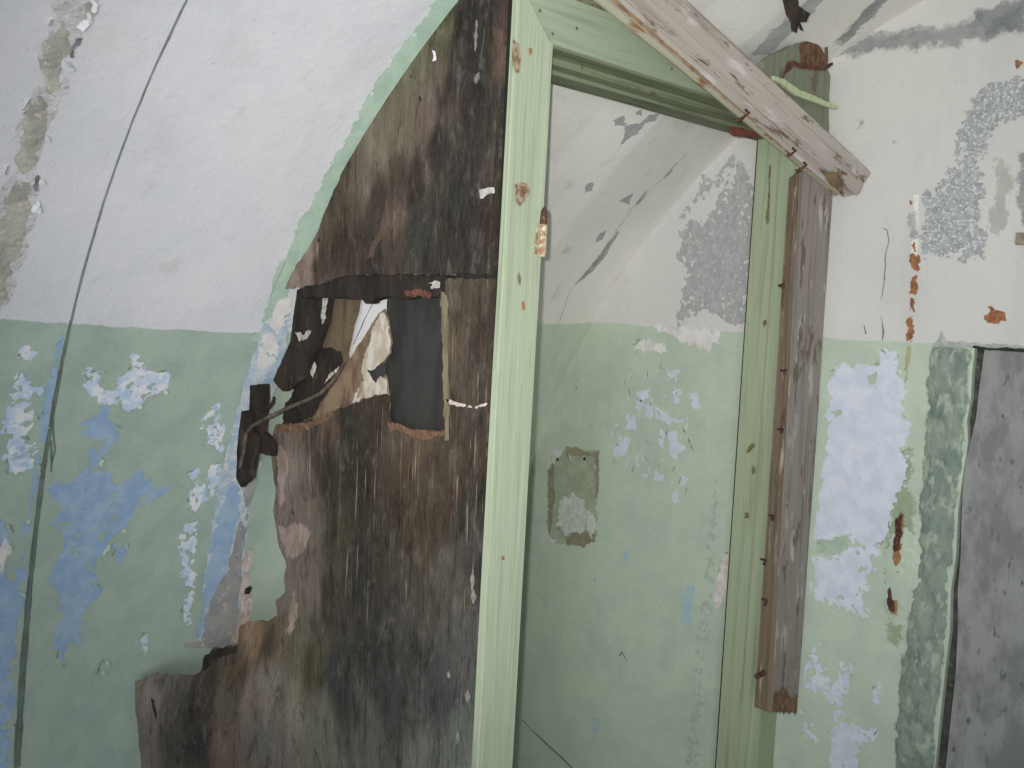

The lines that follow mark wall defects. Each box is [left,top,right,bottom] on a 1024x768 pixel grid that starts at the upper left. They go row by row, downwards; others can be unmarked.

flaking render [0,0,100,311]
peeling [908,74,1024,264]
peeling [603,154,754,504]
corrosion [904,194,921,379]
corrosion [984,306,1006,324]
peeling [0,334,172,768]
flaking render [178,296,311,649]
peeling [798,642,878,768]
peeling [809,348,912,627]
corrosion [887,587,902,644]
corrosion [885,449,913,573]